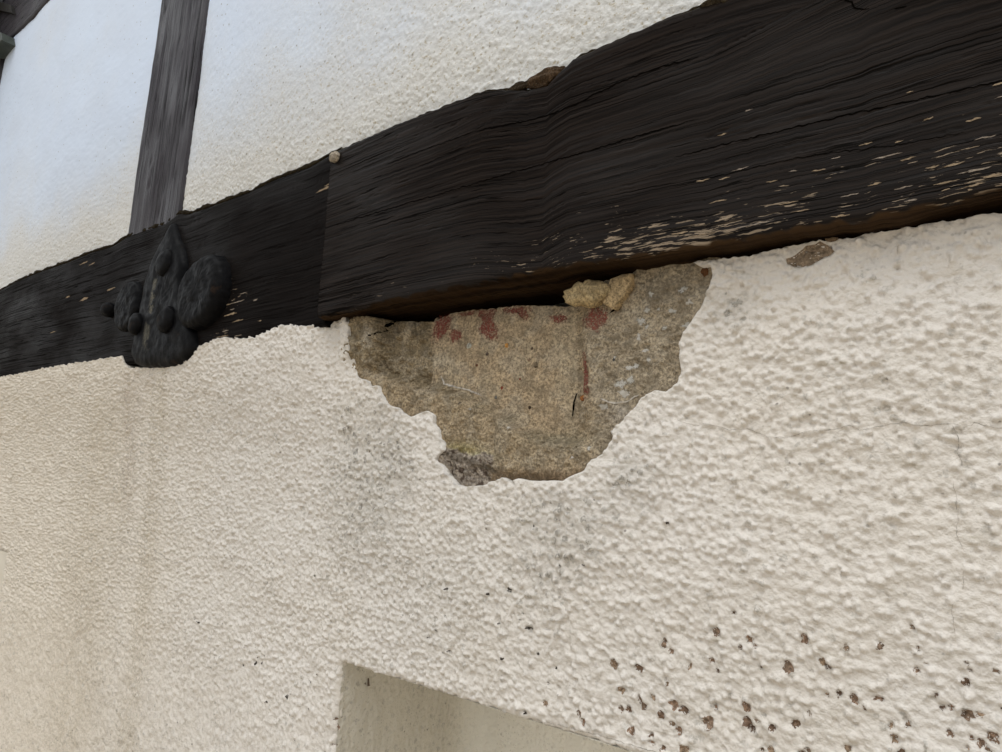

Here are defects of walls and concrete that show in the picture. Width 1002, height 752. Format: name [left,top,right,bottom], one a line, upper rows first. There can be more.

flaking render [341,257,720,487]
crack [676,417,999,590]